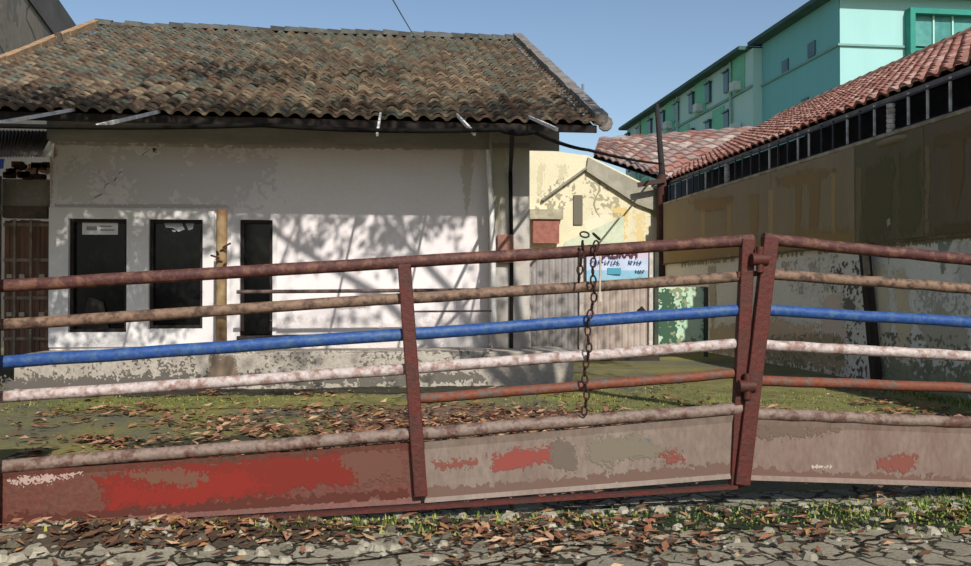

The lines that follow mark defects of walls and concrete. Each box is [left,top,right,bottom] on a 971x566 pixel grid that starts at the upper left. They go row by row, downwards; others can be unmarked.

peeling [583,214,612,232]
spalling [920,307,969,350]